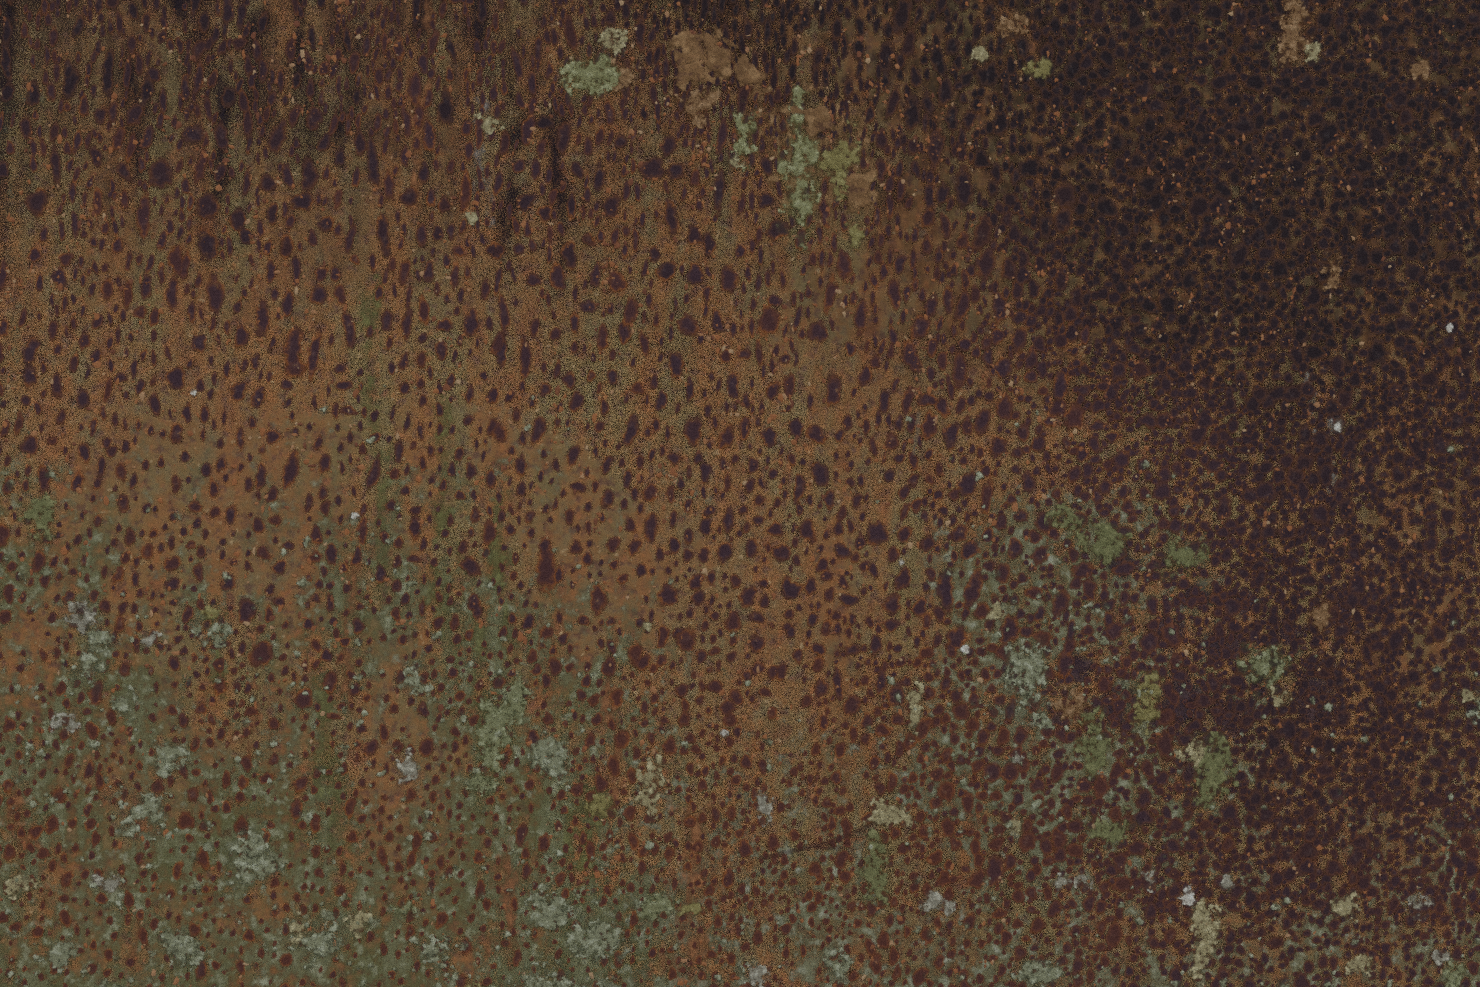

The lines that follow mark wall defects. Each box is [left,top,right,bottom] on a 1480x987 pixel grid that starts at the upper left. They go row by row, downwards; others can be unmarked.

corrosion [166,81,252,315]
corrosion [259,119,380,258]
corrosion [399,0,457,212]
corrosion [486,114,621,259]
corrosion [649,169,739,293]
corrosion [661,25,880,240]
corrosion [283,325,322,382]
corrosion [490,293,532,379]
corrosion [255,430,299,490]
corrosion [739,417,829,504]
corrosion [699,518,852,653]
corrosion [882,436,1023,658]